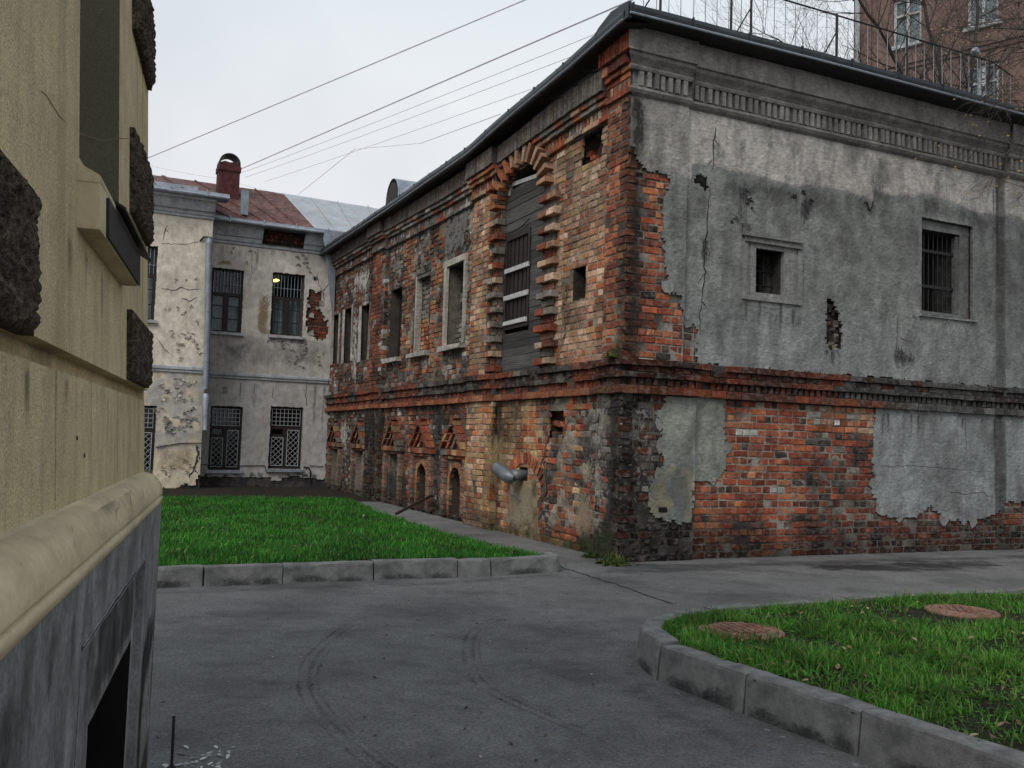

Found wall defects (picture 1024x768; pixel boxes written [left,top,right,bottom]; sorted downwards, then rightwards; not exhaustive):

flaking render [694,174,708,190]
crack [698,127,720,333]
flaking render [661,280,675,293]
flaking render [267,304,327,368]
flaking render [825,299,841,351]
peeling [154,377,198,435]